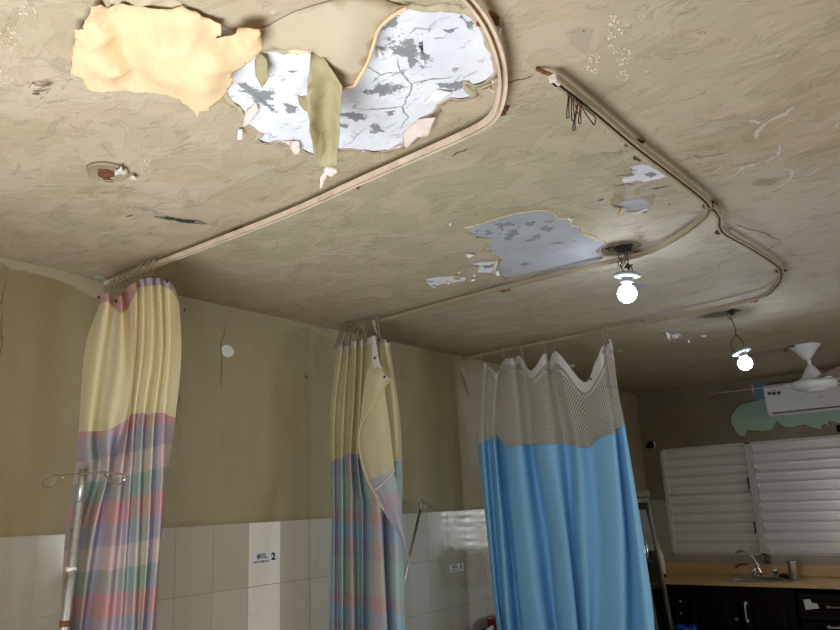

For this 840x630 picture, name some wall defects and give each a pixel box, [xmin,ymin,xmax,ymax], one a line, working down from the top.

peeling [71,0,498,189]
crack [127,197,220,227]
peeling [599,156,668,218]
peeling [425,209,608,288]
peeling [730,383,840,437]